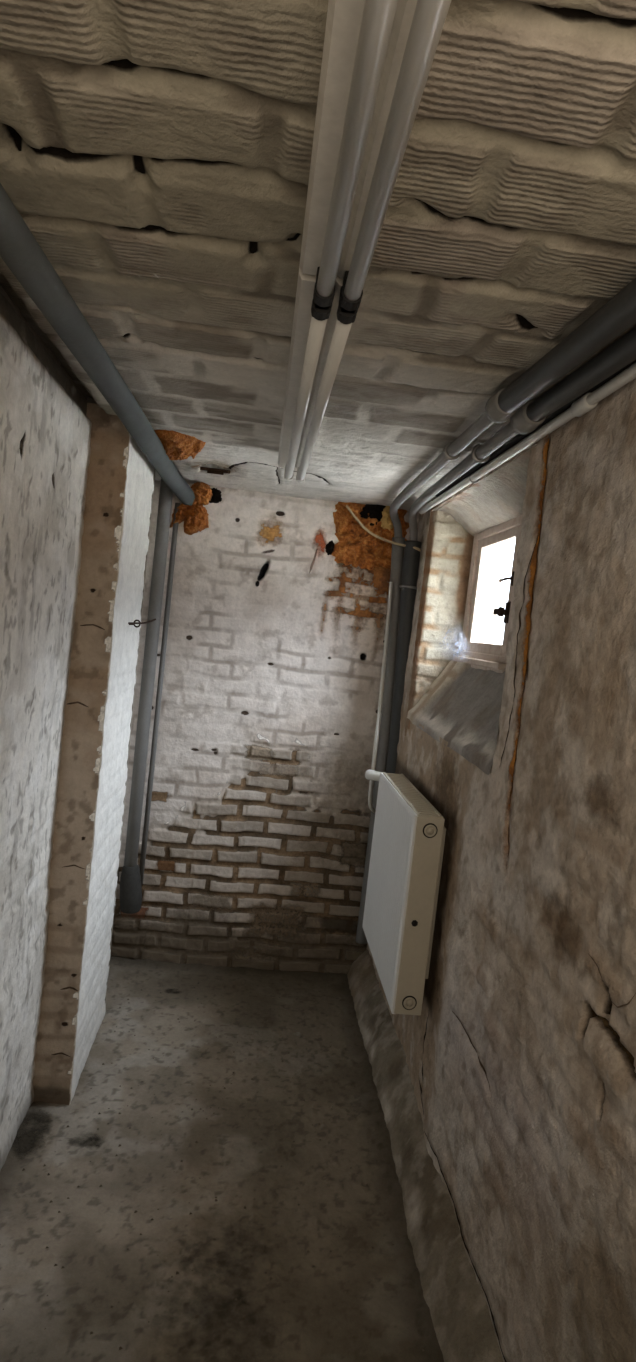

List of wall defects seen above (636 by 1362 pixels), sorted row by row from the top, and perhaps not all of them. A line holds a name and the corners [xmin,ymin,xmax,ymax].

crack [499,441,550,855]
spalling [114,734,369,949]
crack [419,1011,507,1362]
spalling [584,993,636,1077]